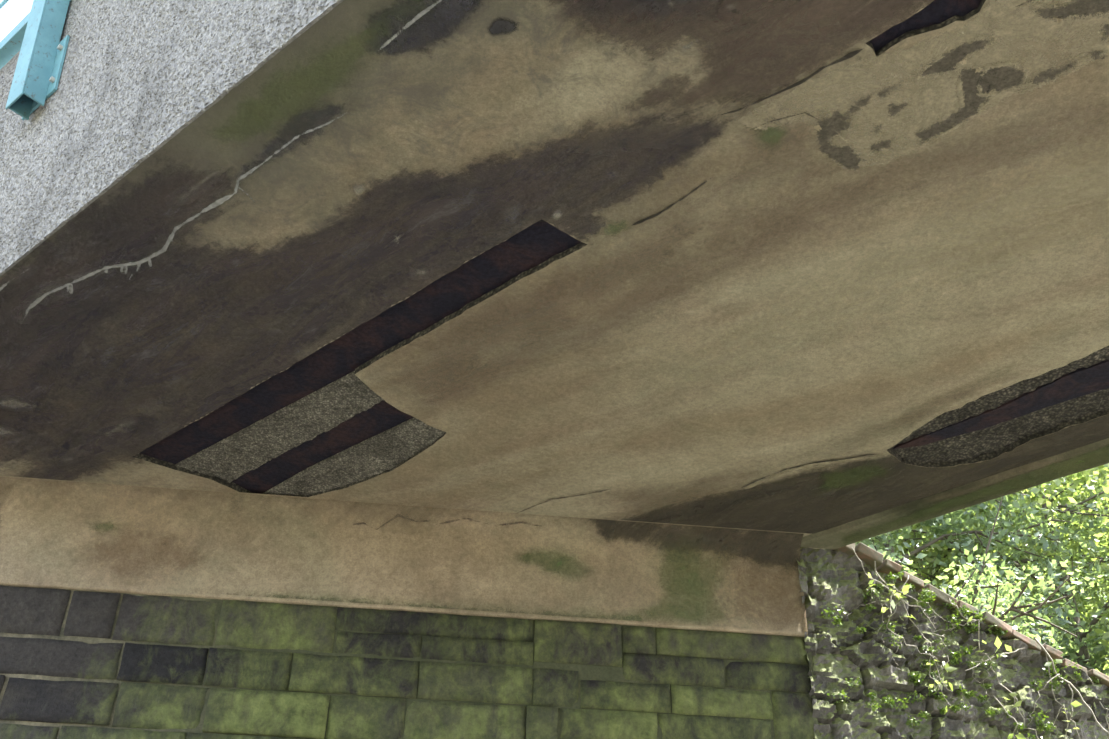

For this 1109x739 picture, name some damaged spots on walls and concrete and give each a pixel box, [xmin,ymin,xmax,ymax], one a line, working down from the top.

crack [378,0,442,51]
crack [721,49,863,130]
peeling [737,0,1109,171]
crack [25,114,344,316]
water stain [0,0,935,481]
crack [633,178,711,225]
spalling [140,222,581,497]
spalling [890,346,1109,463]